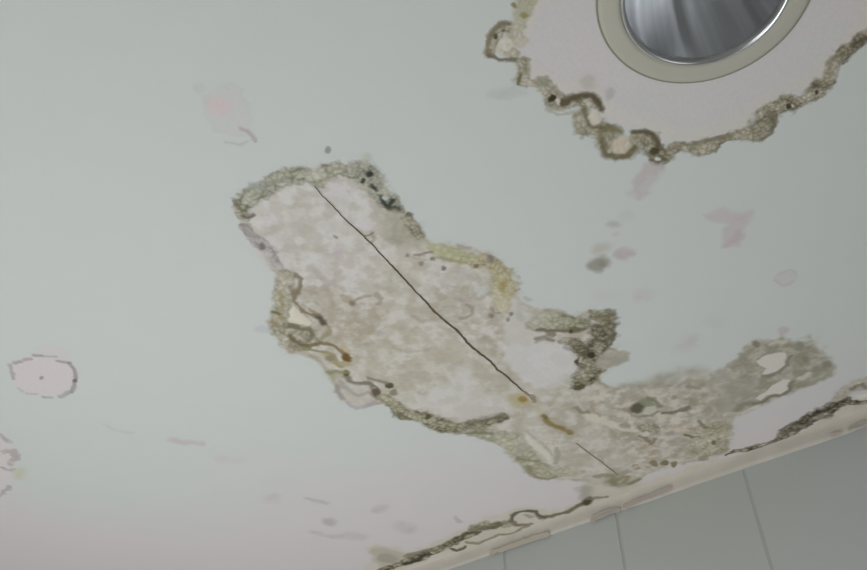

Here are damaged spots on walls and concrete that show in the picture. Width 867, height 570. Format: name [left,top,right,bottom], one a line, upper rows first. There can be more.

crack [315,187,532,400]
peeling [224,152,742,486]
crack [575,443,617,475]